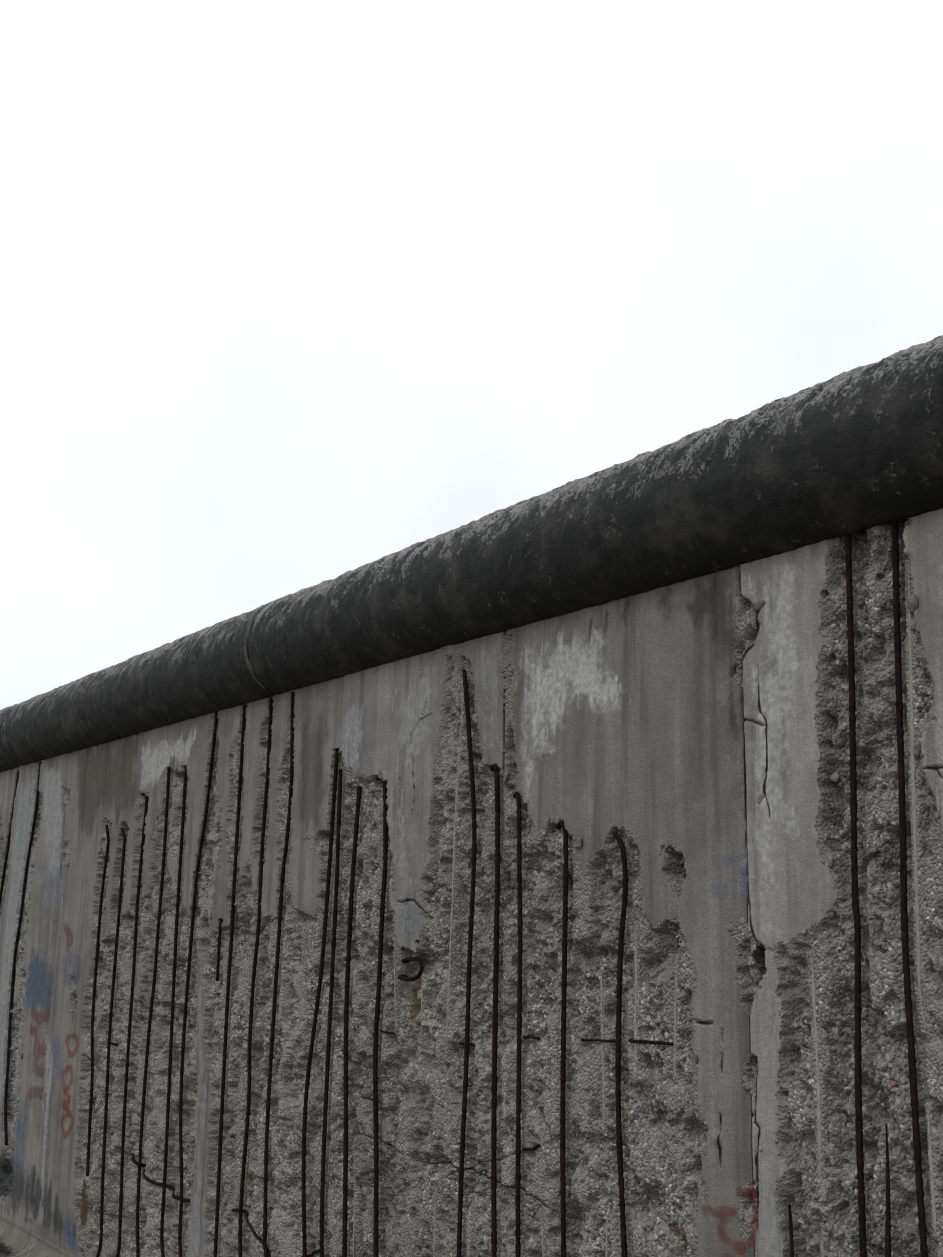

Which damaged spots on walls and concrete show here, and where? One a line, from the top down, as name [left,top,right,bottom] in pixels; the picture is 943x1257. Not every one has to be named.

spalling [68,632,709,1257]
crack [733,572,770,951]
spalling [726,517,943,1257]